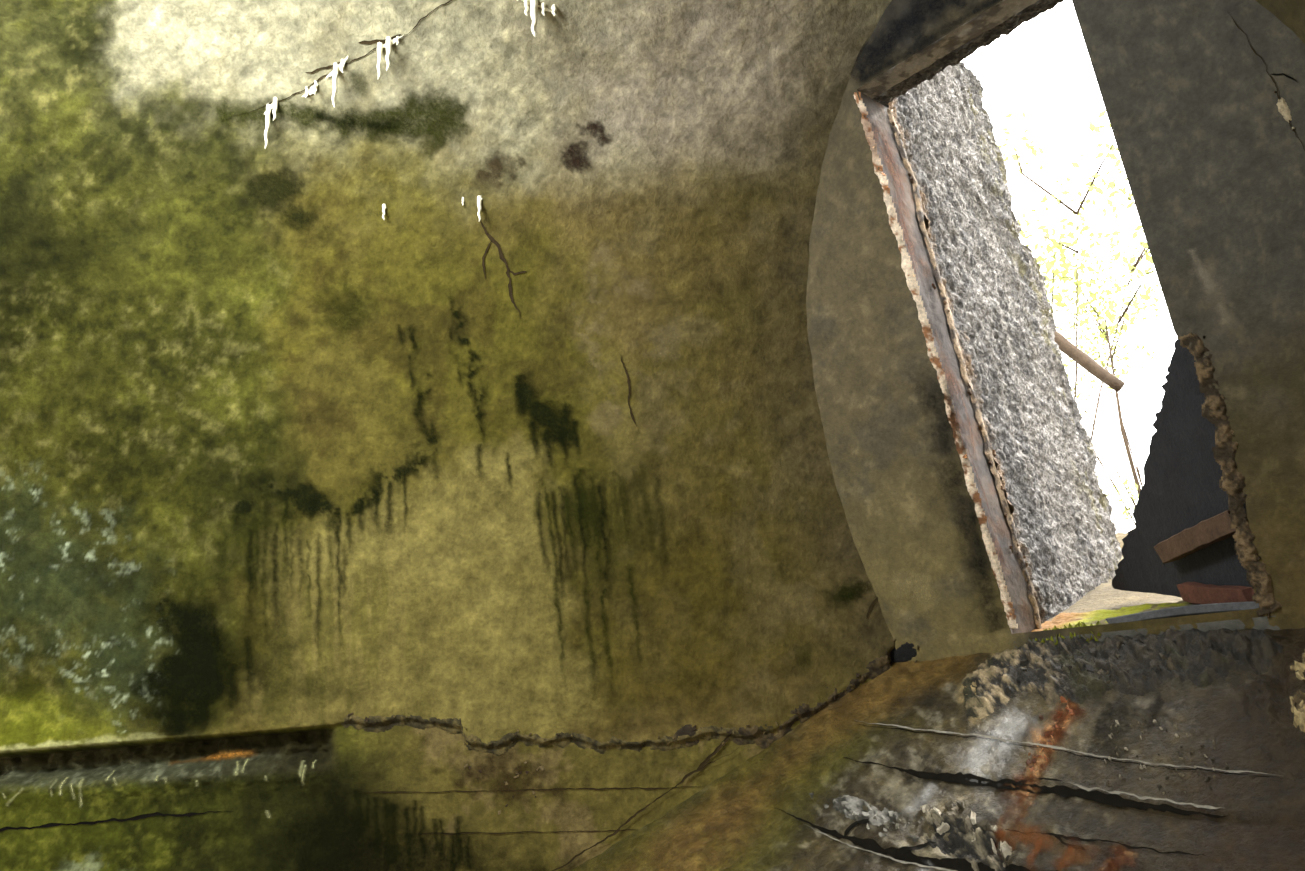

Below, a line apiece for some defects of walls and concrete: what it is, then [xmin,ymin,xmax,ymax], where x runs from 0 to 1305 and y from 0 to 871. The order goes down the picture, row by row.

leakage [215,35,468,156]
leakage [562,122,610,171]
leakage [234,327,437,606]
leakage [449,301,485,468]
leakage [515,375,579,461]
spalling [854,91,1305,732]
leakage [536,469,612,664]
leakage [134,598,252,735]
crack [0,811,233,832]
crack [775,808,1204,871]
corrosion [996,696,1080,834]
crack [843,720,1281,818]